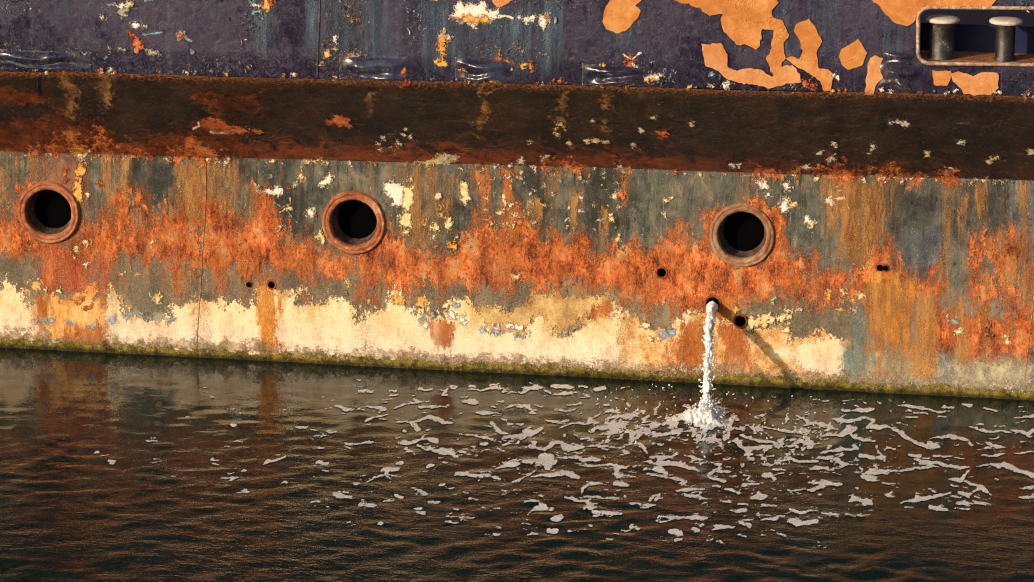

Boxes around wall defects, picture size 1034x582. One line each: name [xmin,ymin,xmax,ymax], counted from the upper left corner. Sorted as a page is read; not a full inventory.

peeling [403,0,570,71]
rust [0,74,1034,377]